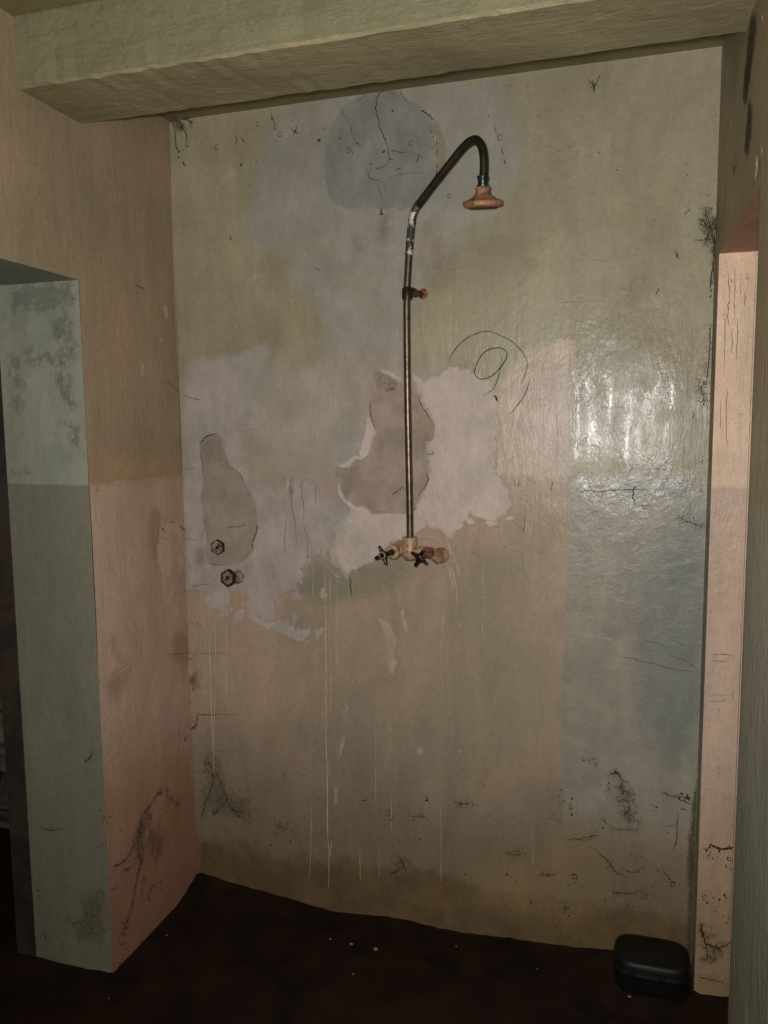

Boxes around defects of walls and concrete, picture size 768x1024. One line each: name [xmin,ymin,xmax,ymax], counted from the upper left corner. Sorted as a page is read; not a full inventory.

crack [338,89,437,196]
damp [694,205,716,298]
damp [4,280,82,459]
peeling [157,77,531,644]
crack [580,467,667,507]
damp [43,618,732,984]
crack [569,792,691,886]
crack [704,843,735,853]